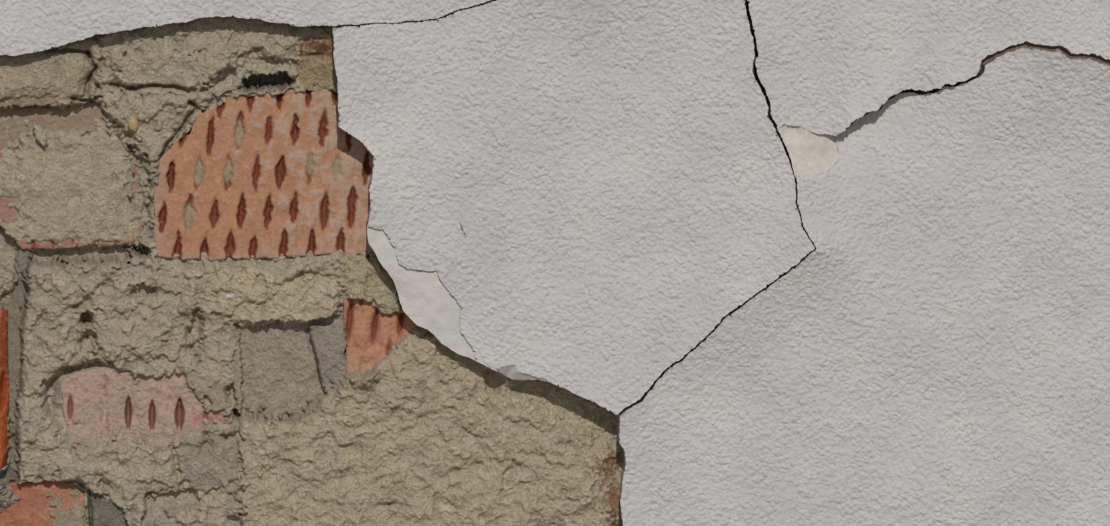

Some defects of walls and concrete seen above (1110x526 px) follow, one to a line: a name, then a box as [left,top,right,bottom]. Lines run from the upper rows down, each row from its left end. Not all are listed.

spalling [0,15,624,526]
crack [332,0,496,28]
crack [619,0,816,415]
crack [842,41,1110,133]